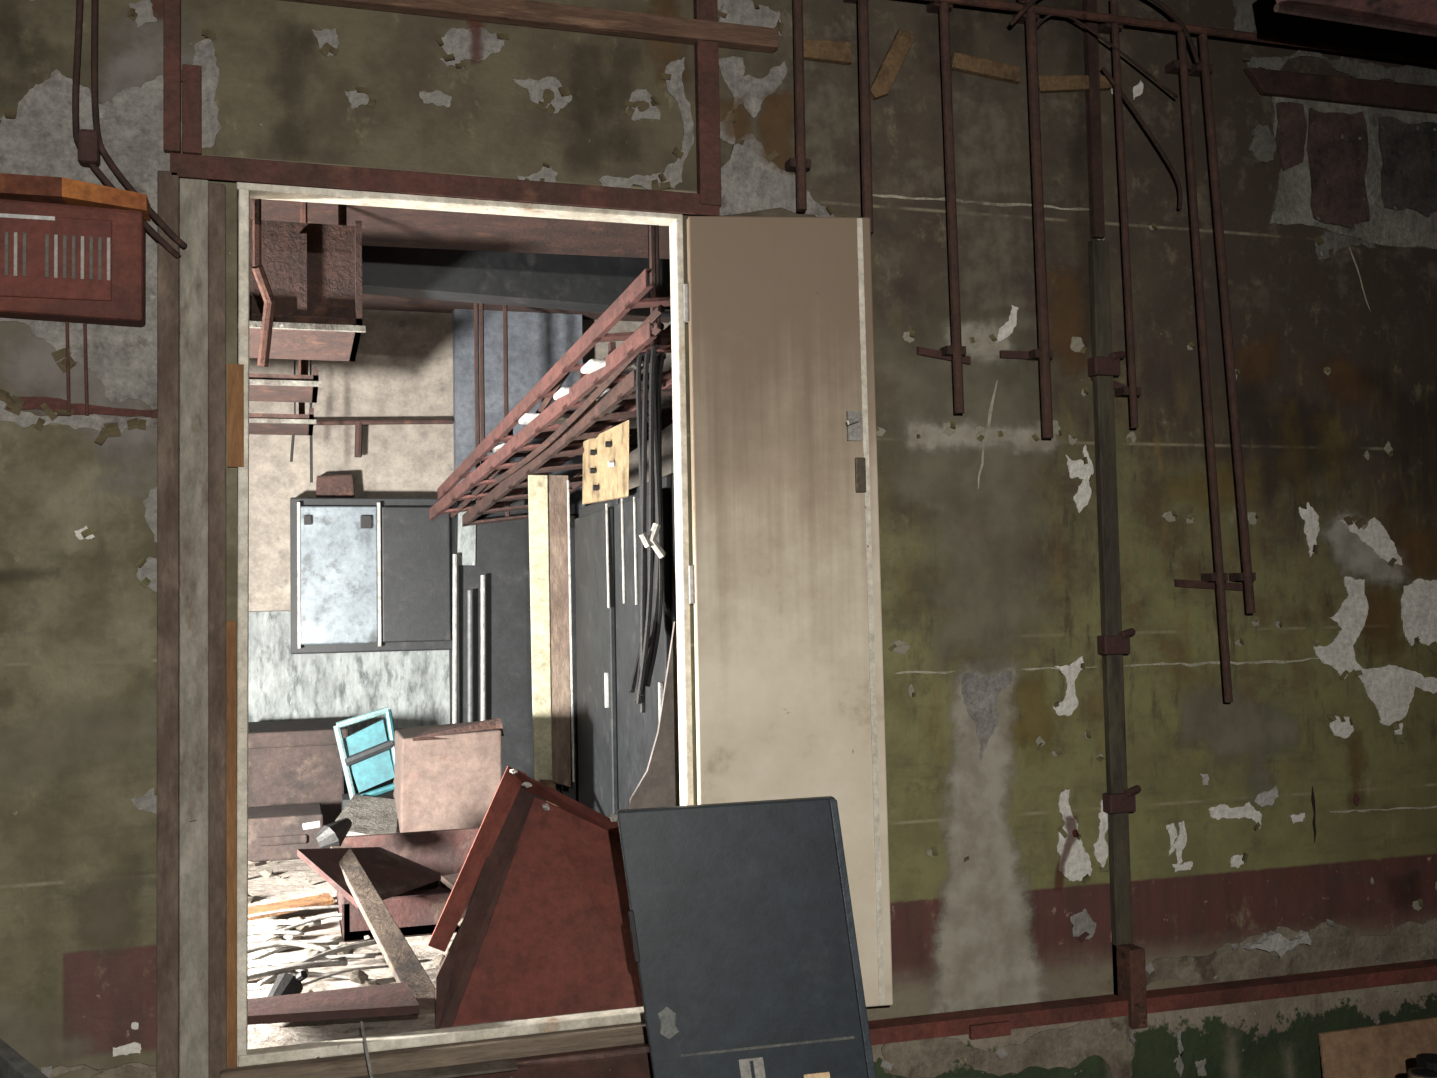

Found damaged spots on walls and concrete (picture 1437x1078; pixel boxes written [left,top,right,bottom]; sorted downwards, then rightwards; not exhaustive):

flaking render [717,0,784,38]
peeling [181,29,222,149]
flaking render [513,76,572,115]
flaking render [599,57,694,190]
flaking render [719,56,846,217]
flaking render [0,69,170,444]
peeling [1029,420,1094,513]
water stain [874,87,1059,1014]
peeling [1298,500,1437,744]
peeling [1053,656,1085,716]
peeling [1057,789,1110,885]
flaking render [1146,881,1437,986]